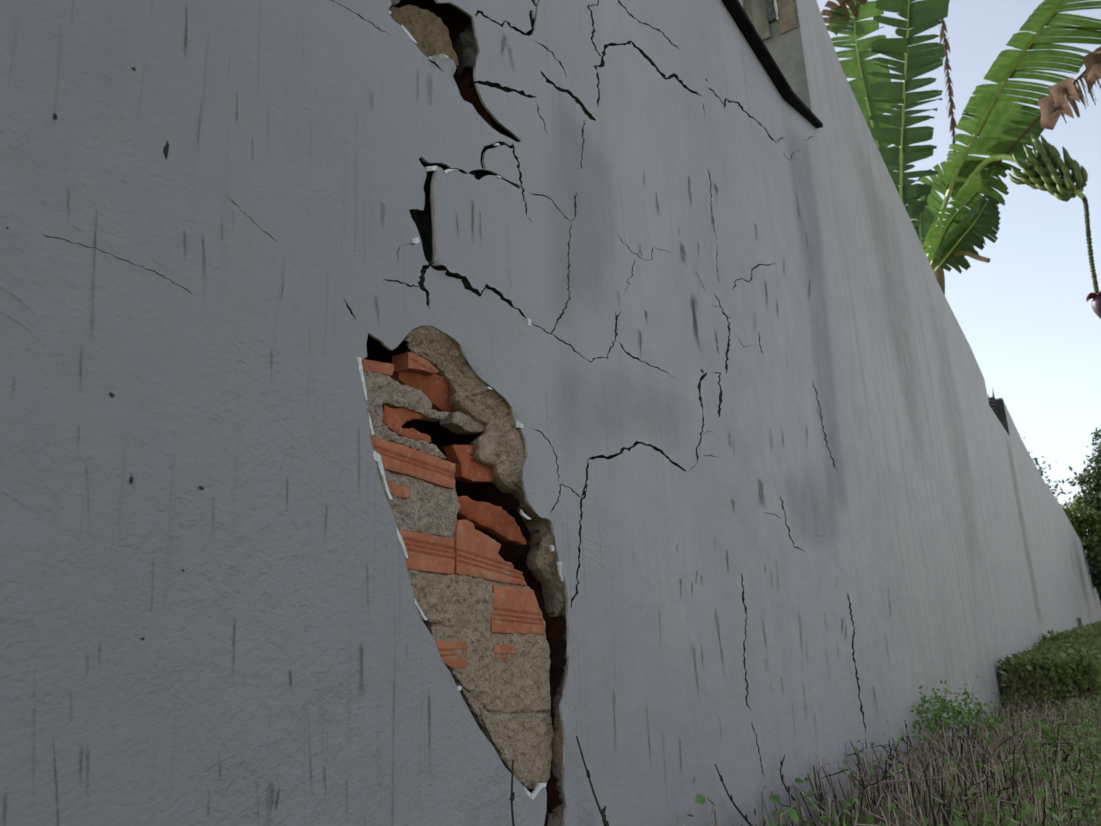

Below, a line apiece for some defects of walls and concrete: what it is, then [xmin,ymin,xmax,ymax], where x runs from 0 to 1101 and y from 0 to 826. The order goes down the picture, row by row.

flaking render [388,0,517,261]
crack [383,0,810,376]
flaking render [357,326,567,826]
crack [534,171,775,608]
crack [741,574,764,775]
crack [768,496,804,551]
crack [812,380,837,471]
crack [847,592,867,747]